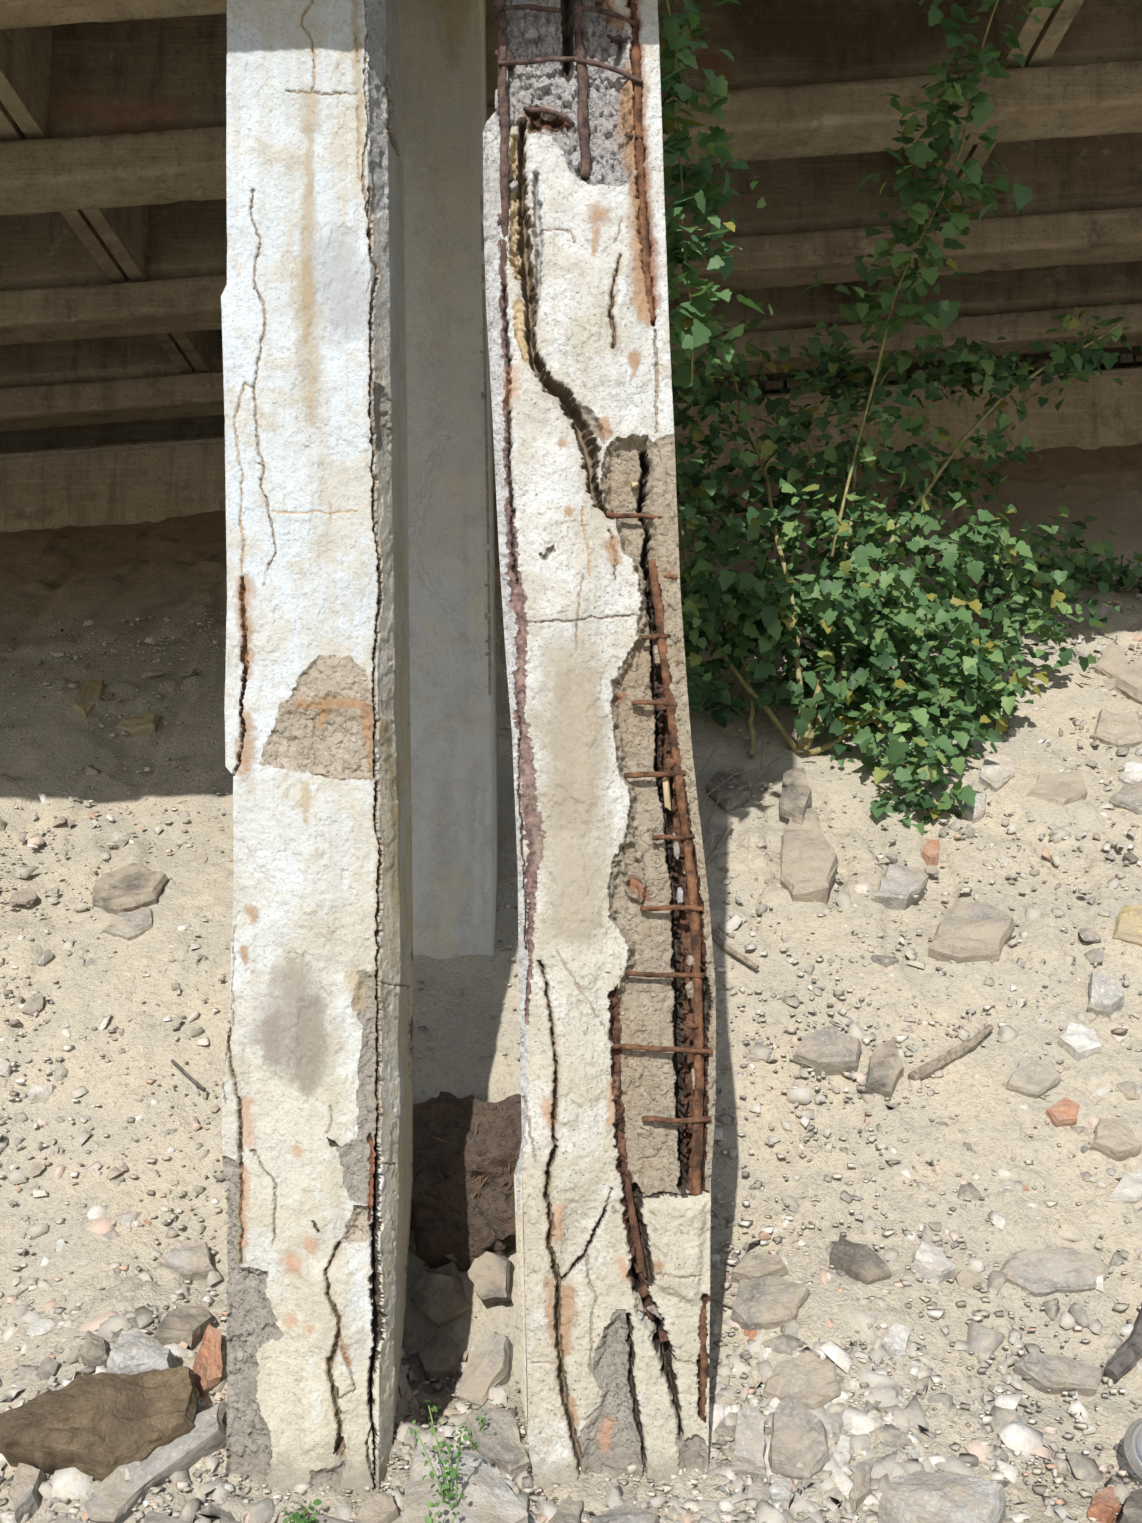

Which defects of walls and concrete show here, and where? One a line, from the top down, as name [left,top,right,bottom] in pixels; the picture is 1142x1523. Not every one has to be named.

crack [480,118,637,696]
spalling [494,0,634,187]
corrosion [621,0,661,434]
spalling [258,655,374,780]
crack [233,0,410,1479]
corrosion [497,239,547,1025]
spalling [0,922,210,1197]
water stain [266,968,323,1092]
spalling [389,1347,518,1465]
crack [522,948,607,1475]
crack [653,1272,699,1280]
spalling [580,433,1142,1523]